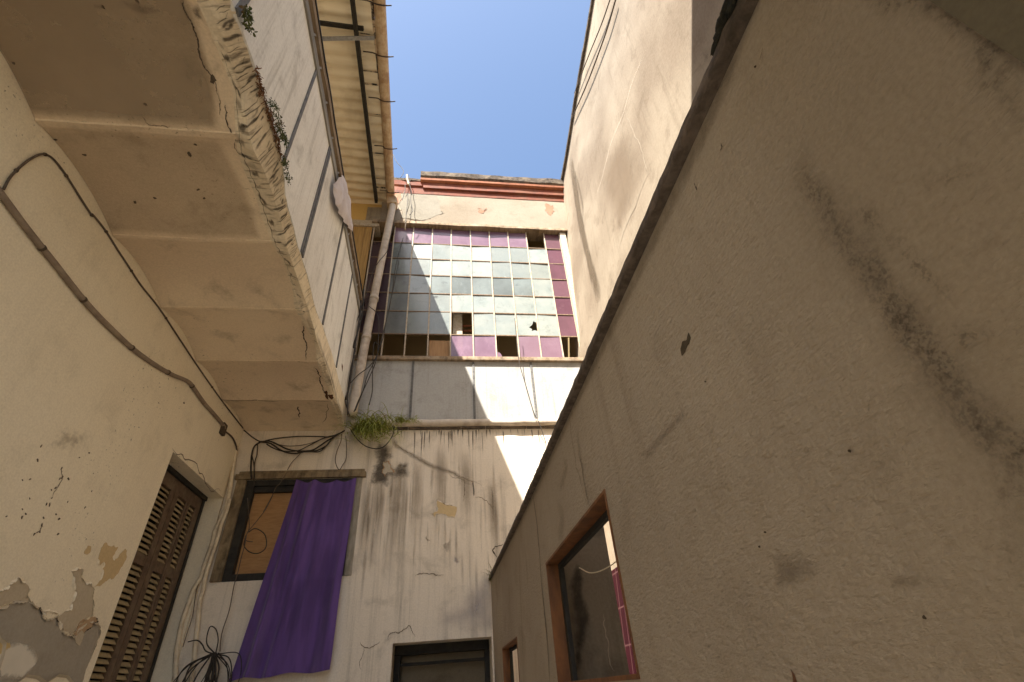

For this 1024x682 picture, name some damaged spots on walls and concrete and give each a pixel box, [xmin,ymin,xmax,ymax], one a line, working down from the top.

crack [182,2,238,153]
crack [230,326,329,422]
water stain [374,430,490,494]
peeling [0,542,127,682]
crack [359,625,413,669]